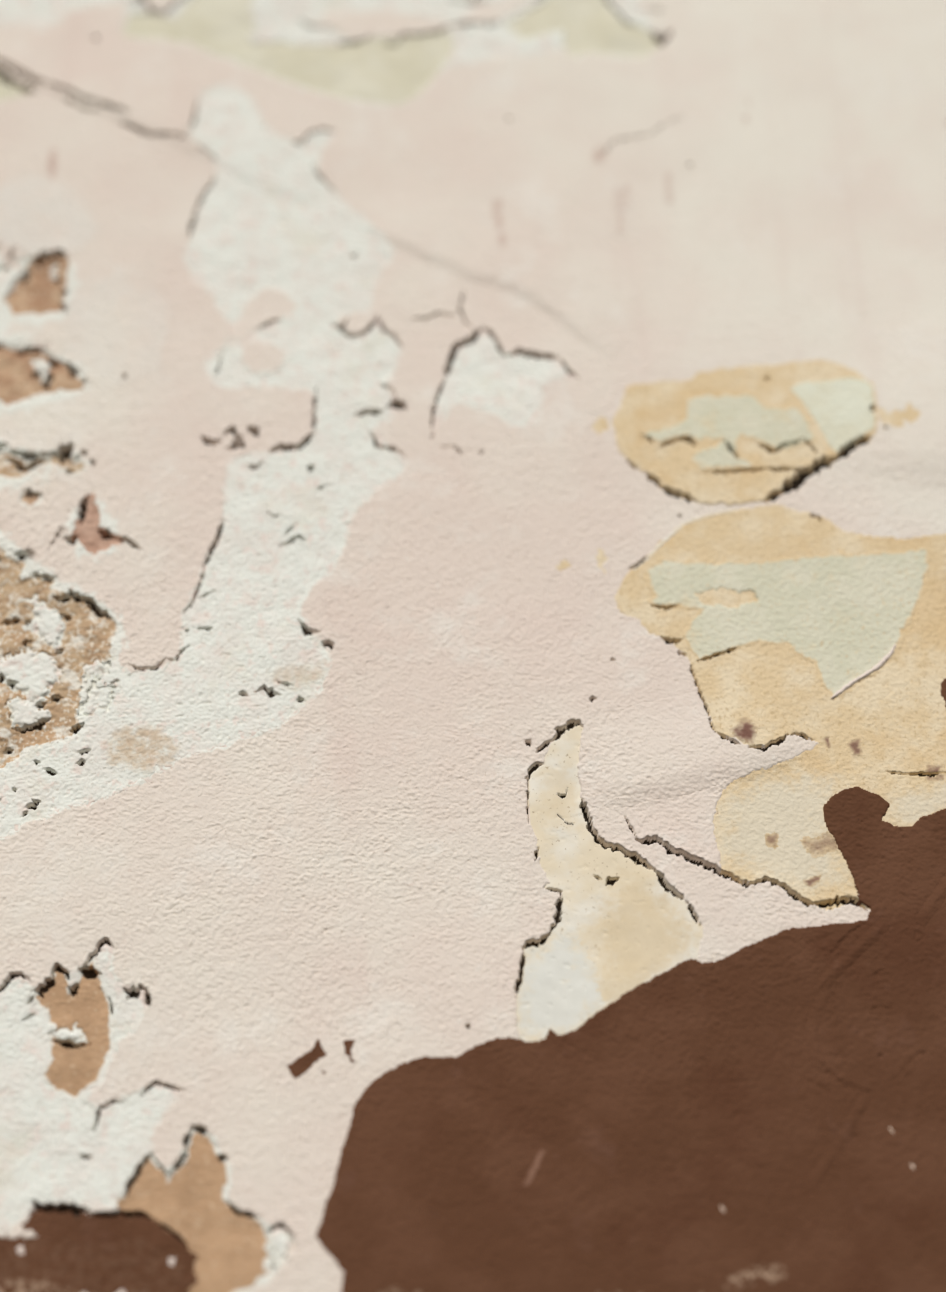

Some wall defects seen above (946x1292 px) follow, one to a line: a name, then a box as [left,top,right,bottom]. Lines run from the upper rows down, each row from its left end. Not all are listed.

peeling [0,0,675,105]
peeling [0,79,410,838]
peeling [431,291,578,439]
peeling [591,360,946,910]
peeling [515,722,703,1042]
peeling [0,940,296,1292]